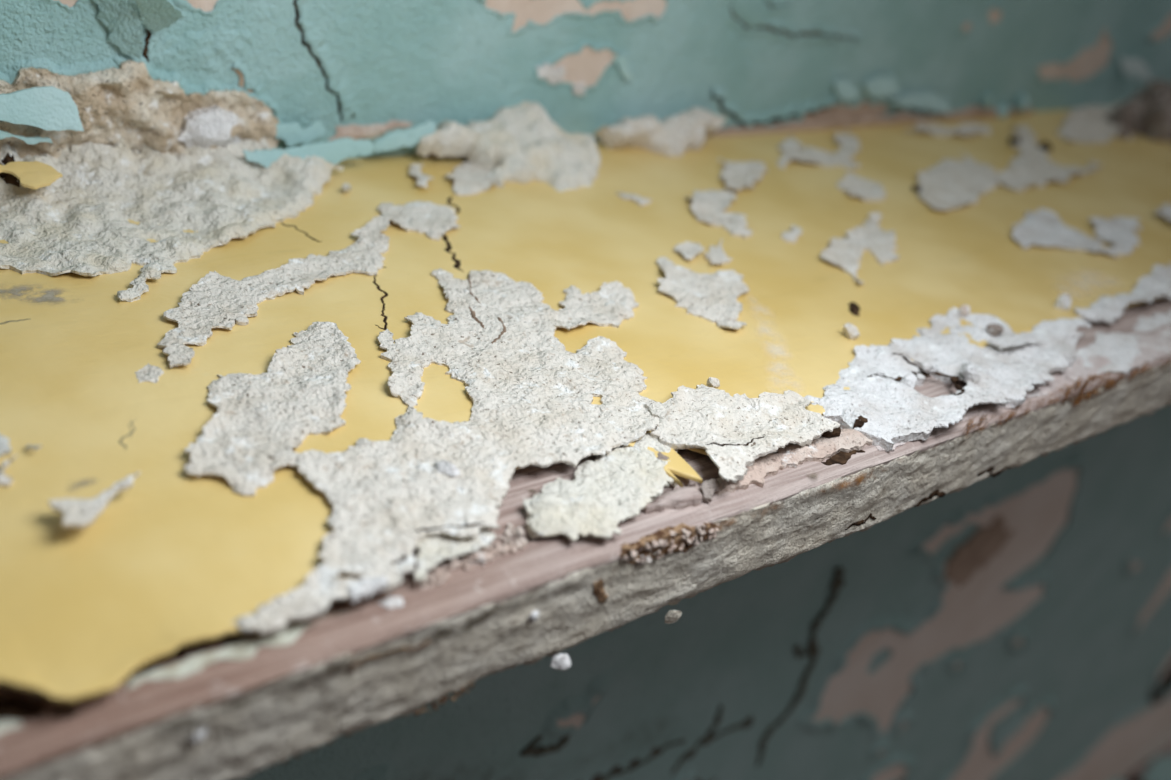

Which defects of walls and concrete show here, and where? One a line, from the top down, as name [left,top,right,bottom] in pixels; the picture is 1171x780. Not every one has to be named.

flaking render [0,0,436,189]
peeling [135,162,499,383]
crack [293,0,356,122]
crack [371,266,394,349]
peeling [656,127,900,329]
peeling [911,103,1124,211]
peeling [1011,208,1142,259]
peeling [48,471,140,527]
peeling [184,263,1171,635]
crack [520,733,571,757]
crack [592,567,845,780]
peeling [796,451,1084,741]